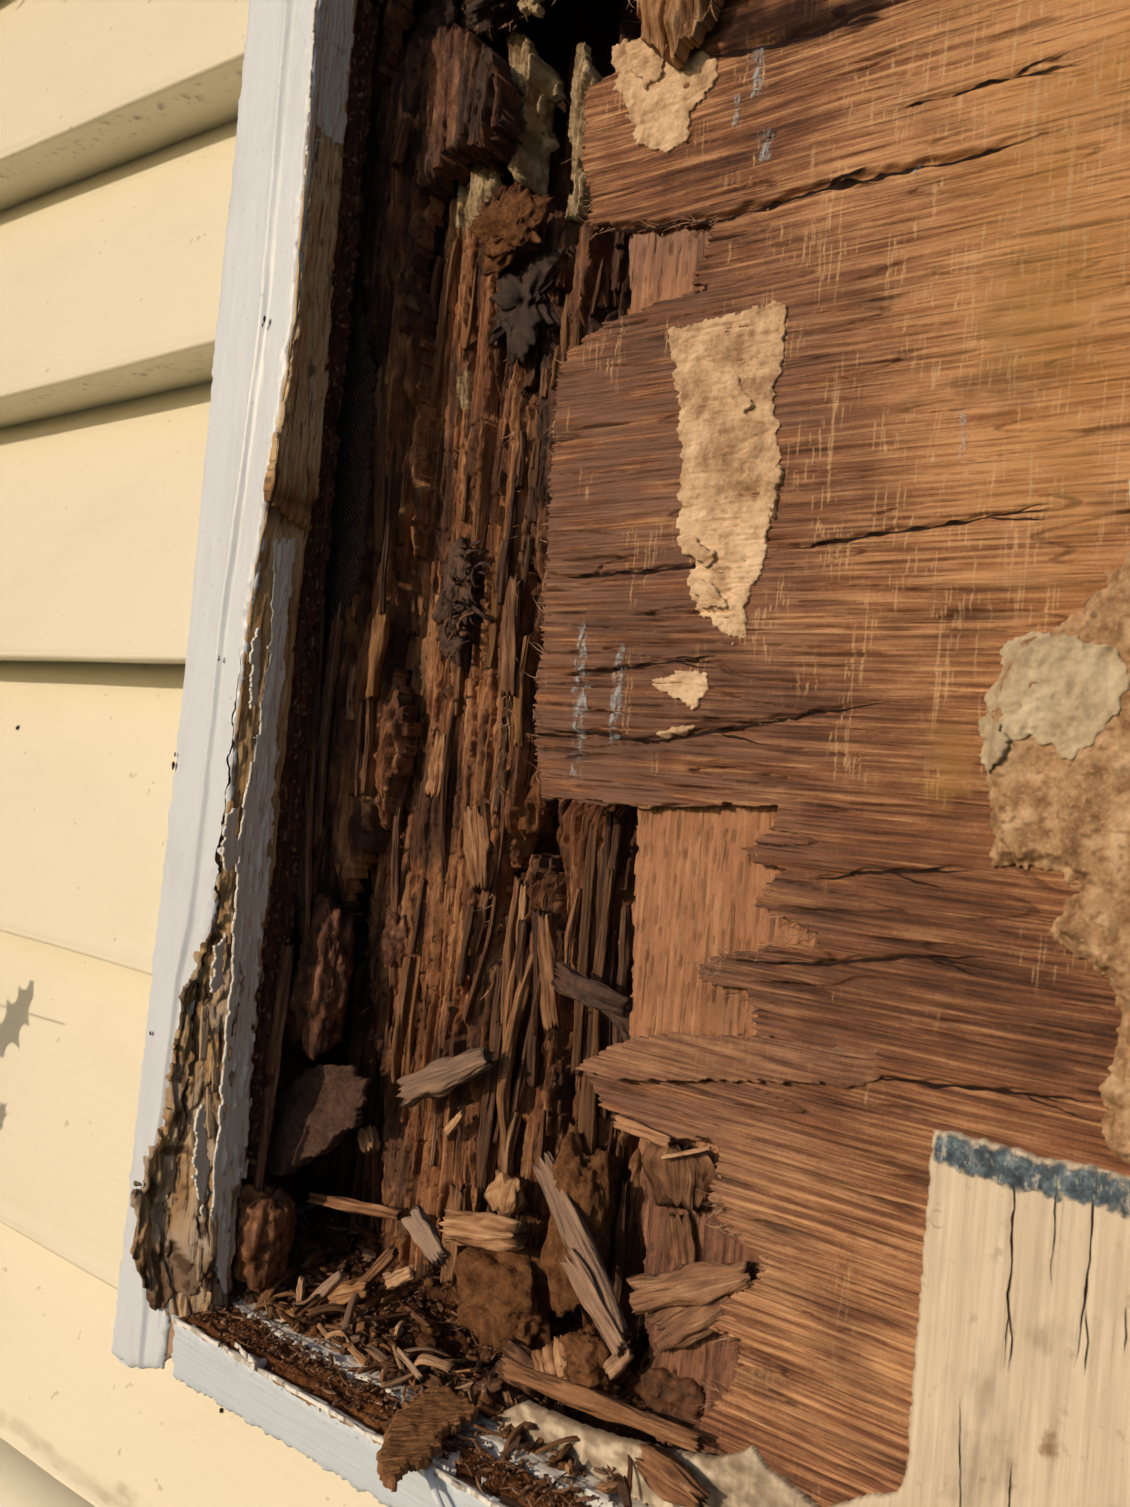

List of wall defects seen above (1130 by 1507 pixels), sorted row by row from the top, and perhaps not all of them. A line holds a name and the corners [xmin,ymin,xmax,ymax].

spalling [473,0,719,213]
crack [568,501,1053,579]
peeling [130,0,428,1444]
peeling [978,631,1130,776]
spalling [516,800,564,884]
crack [814,866,968,890]
crack [749,955,1023,978]
crack [1003,1189,1015,1373]
crack [1050,1166,1098,1373]
peeling [429,1413,651,1507]